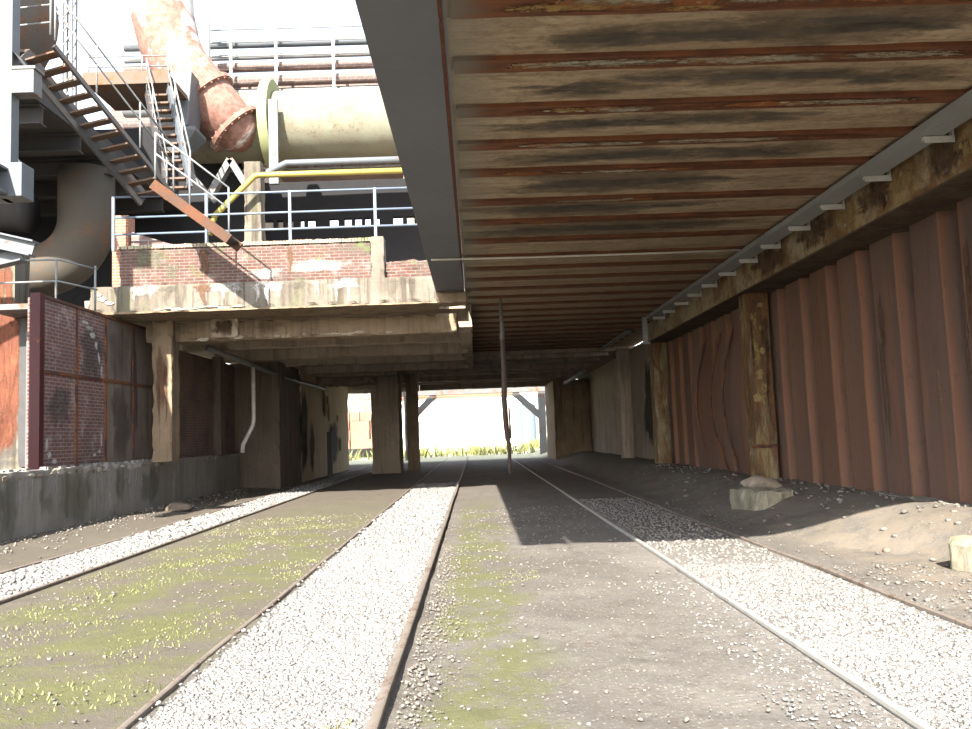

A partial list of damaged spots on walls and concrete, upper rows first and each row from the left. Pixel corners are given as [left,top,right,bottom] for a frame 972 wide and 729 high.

rust [512,0,972,12]
damp [555,31,777,45]
rust [509,50,972,69]
rust [515,98,920,114]
rust [437,0,463,280]
rust [526,134,876,148]
rust [497,163,834,175]
rust [506,194,791,204]
rust [501,234,735,243]
rust [0,267,20,450]
damp [300,395,315,473]